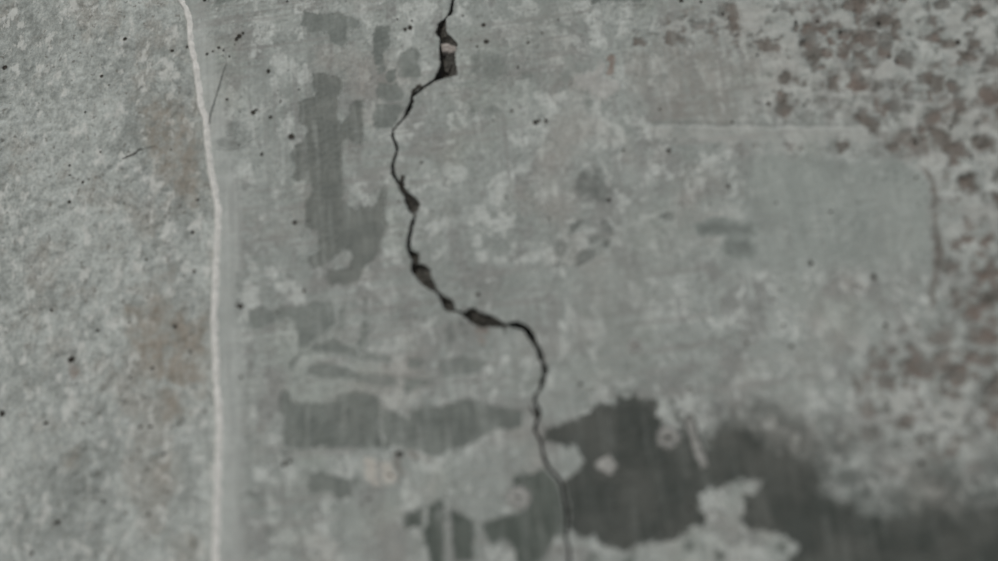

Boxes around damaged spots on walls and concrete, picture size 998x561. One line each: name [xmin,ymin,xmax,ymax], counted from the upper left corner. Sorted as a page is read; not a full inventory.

crack [389,0,574,561]